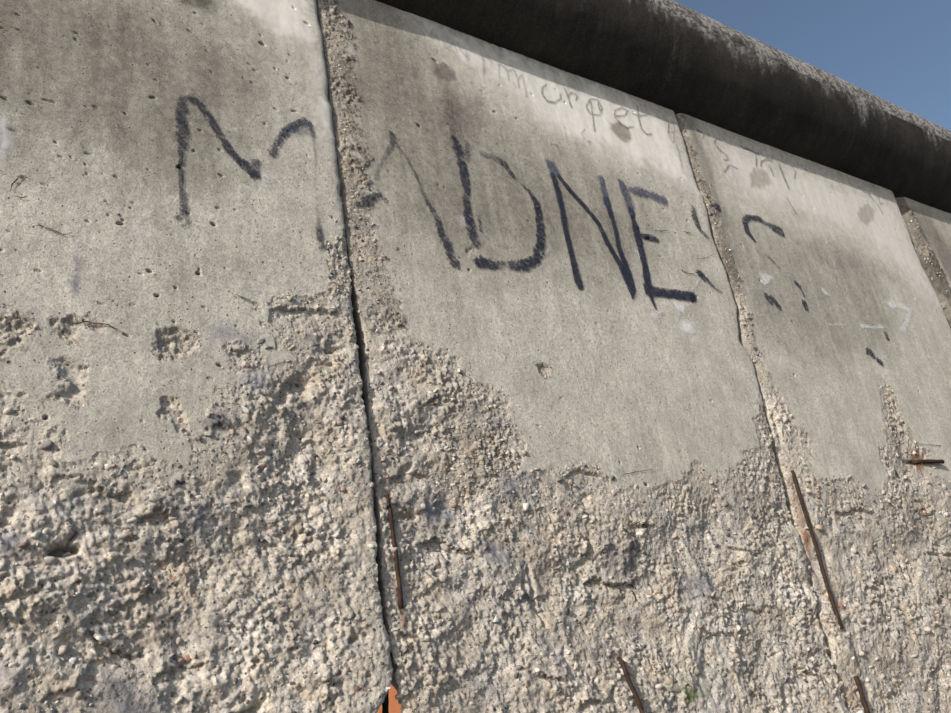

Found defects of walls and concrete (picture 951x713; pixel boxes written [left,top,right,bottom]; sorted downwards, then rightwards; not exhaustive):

spalling [0,0,408,713]
spalling [362,113,951,713]